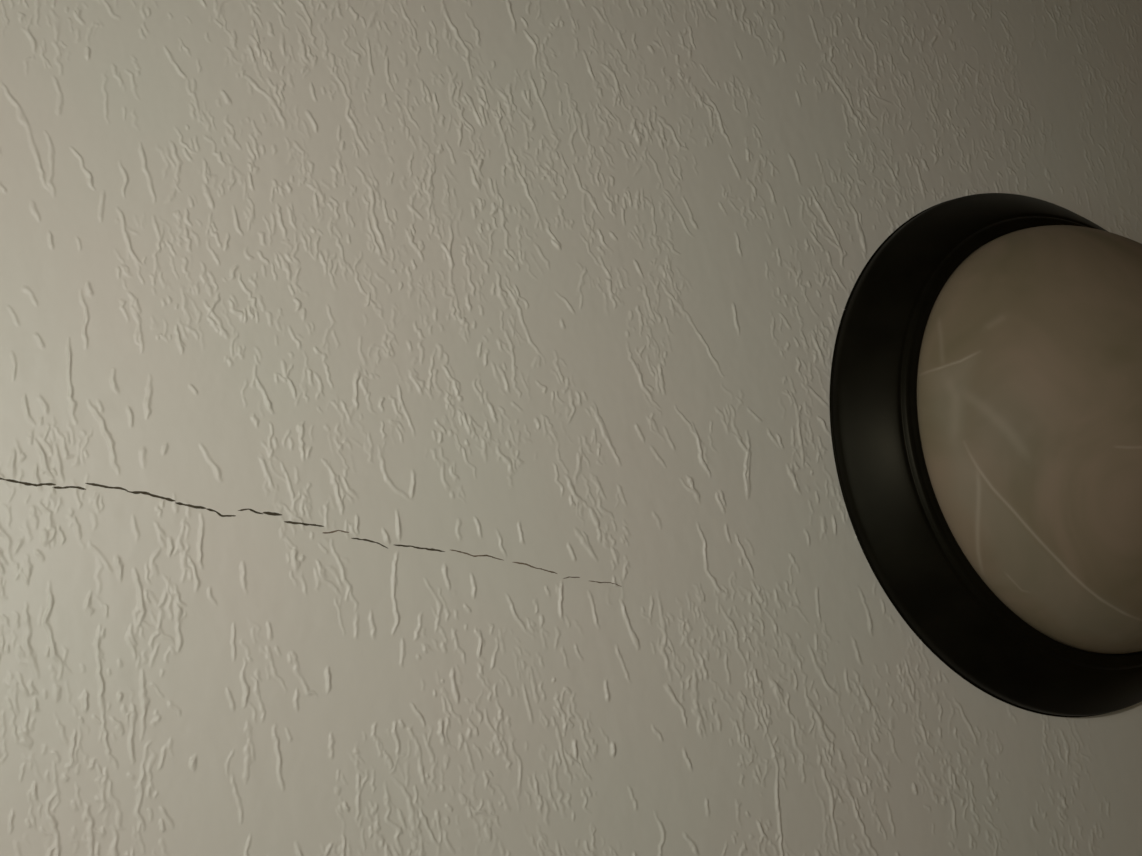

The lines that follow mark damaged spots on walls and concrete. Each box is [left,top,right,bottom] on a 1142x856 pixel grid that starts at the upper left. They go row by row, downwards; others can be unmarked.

crack [0,478,622,587]